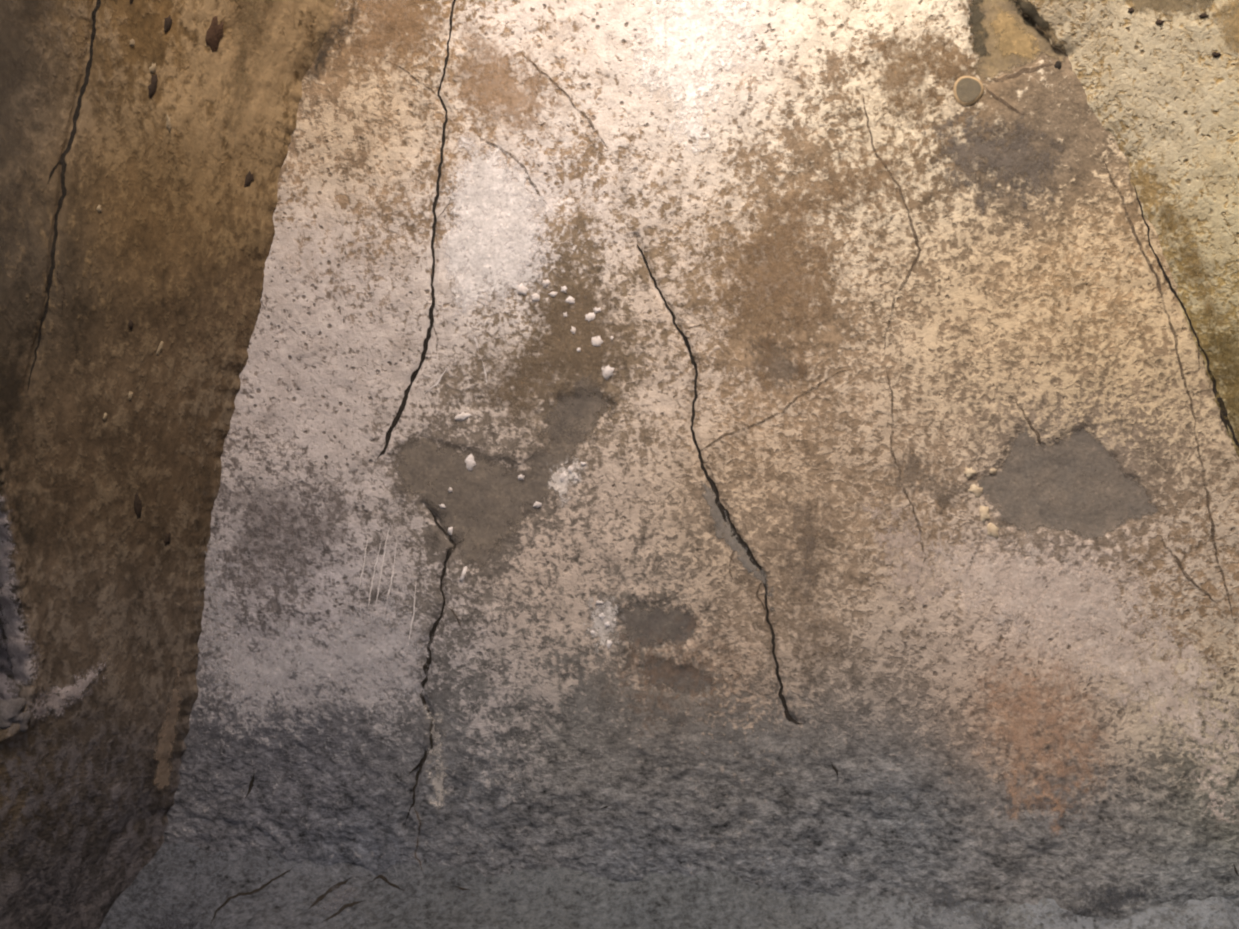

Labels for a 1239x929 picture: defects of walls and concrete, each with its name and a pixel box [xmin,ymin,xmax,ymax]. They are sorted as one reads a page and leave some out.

crack [27,0,101,391]
crack [374,0,456,462]
leakage [442,136,549,315]
leakage [460,26,560,138]
crack [475,134,550,210]
leakage [548,458,583,506]
crack [637,238,850,725]
spalling [968,0,1066,82]
crack [1103,158,1239,619]
crack [306,507,472,923]